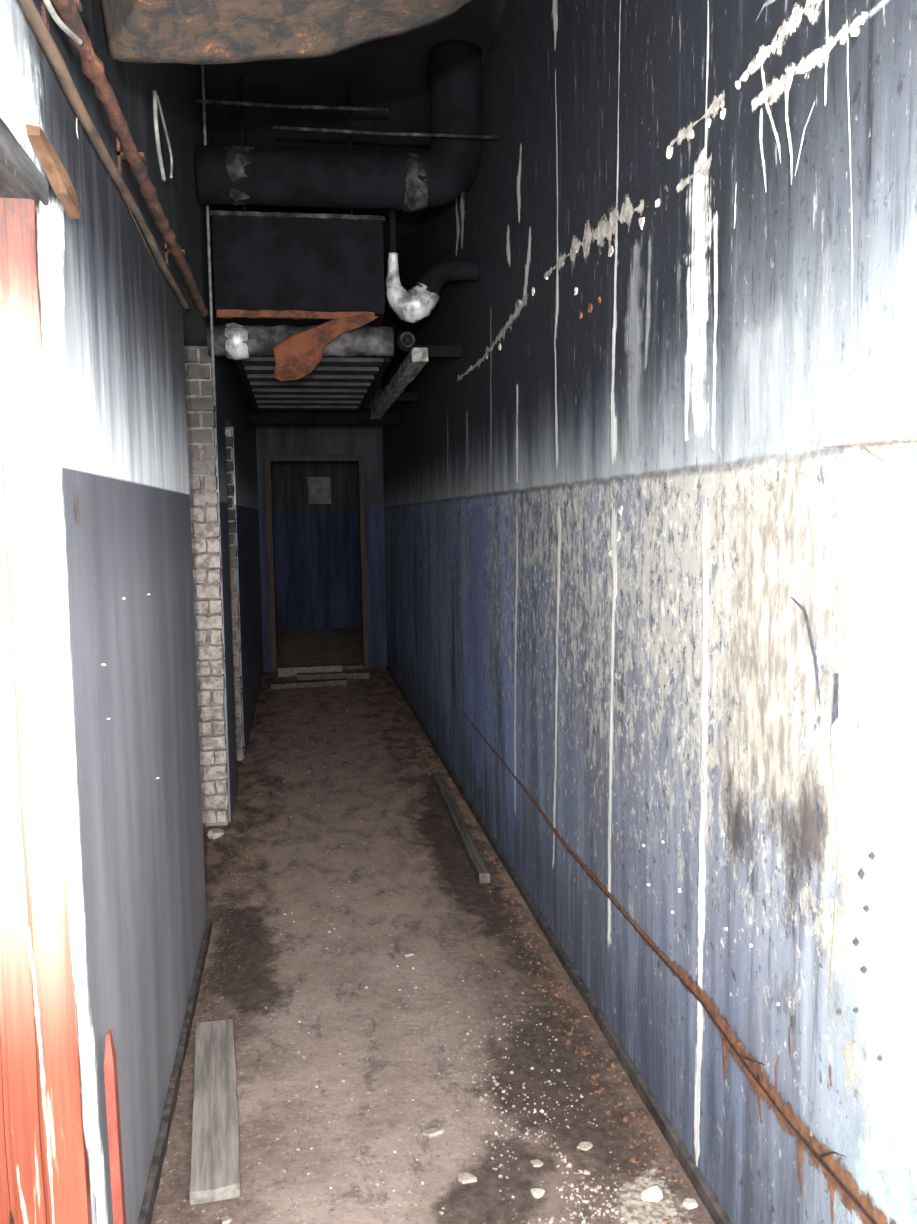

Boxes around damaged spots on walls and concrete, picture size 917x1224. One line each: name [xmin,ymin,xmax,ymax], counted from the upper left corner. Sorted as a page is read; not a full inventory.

damp [456,191,465,256]
damp [506,145,532,299]
damp [611,88,650,465]
damp [684,0,718,450]
damp [739,320,792,447]
damp [759,0,829,192]
damp [552,504,561,869]
damp [607,502,618,947]
corrosion [463,713,896,1224]
damp [694,493,710,1166]
damp [727,781,753,861]
damp [772,766,827,924]